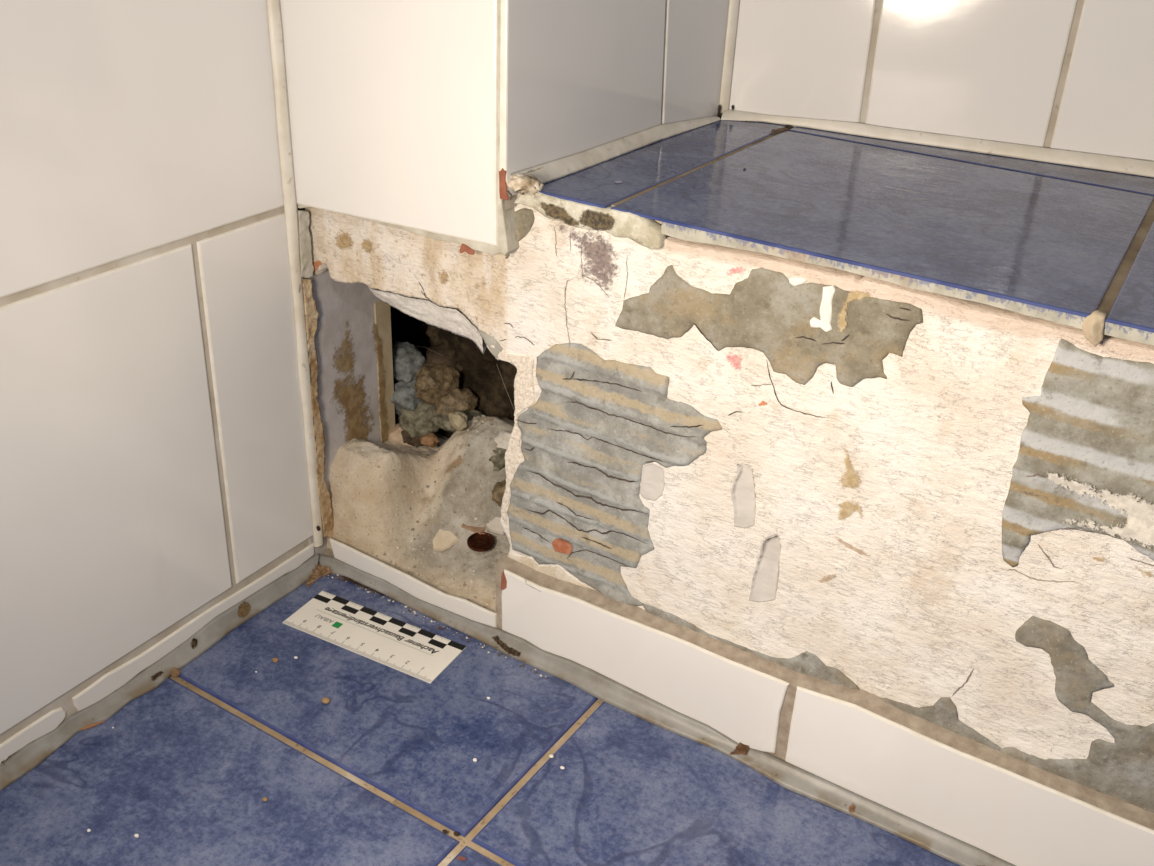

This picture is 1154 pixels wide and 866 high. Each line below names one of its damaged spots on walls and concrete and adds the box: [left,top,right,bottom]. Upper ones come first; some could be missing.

peeling [459,244,475,255]
spalling [367,285,536,535]
spalling [640,463,665,501]
flaking render [433,529,459,551]